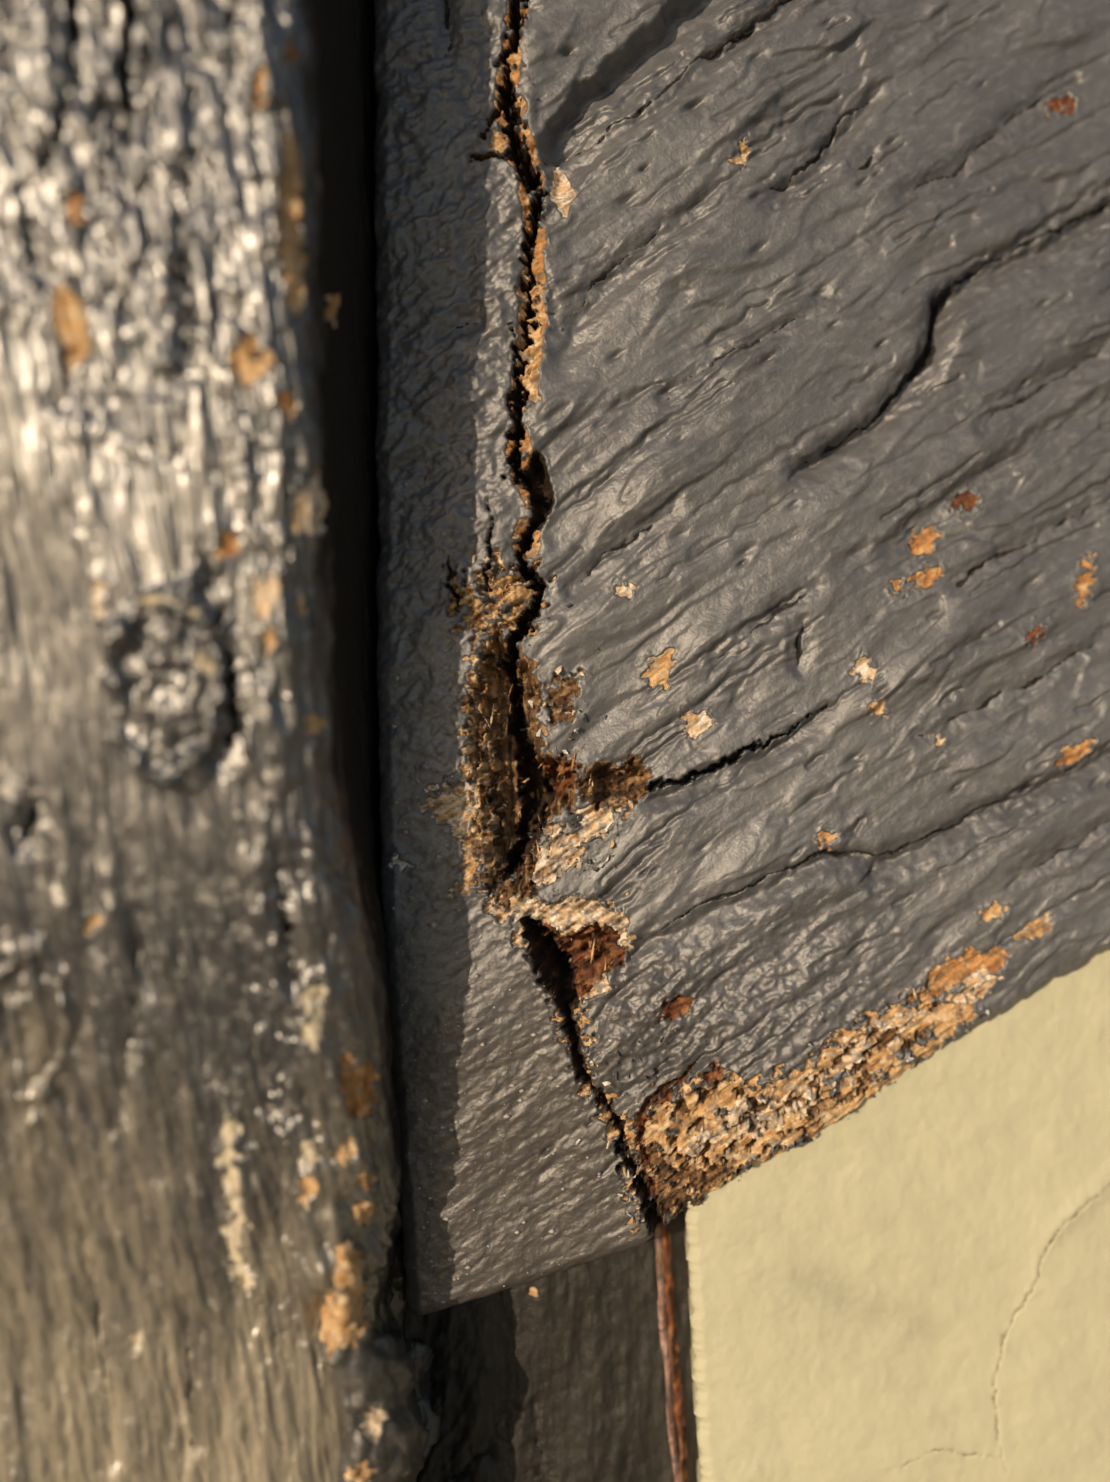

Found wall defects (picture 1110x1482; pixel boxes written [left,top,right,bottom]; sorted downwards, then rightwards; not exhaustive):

peeling [275,132,309,320]
peeling [614,580,636,599]
crack [415,0,1110,1235]
peeling [339,1052,381,1119]
peeling [596,912,1055,1222]
peeling [297,1137,378,1360]
crack [889,1184,1110,1471]